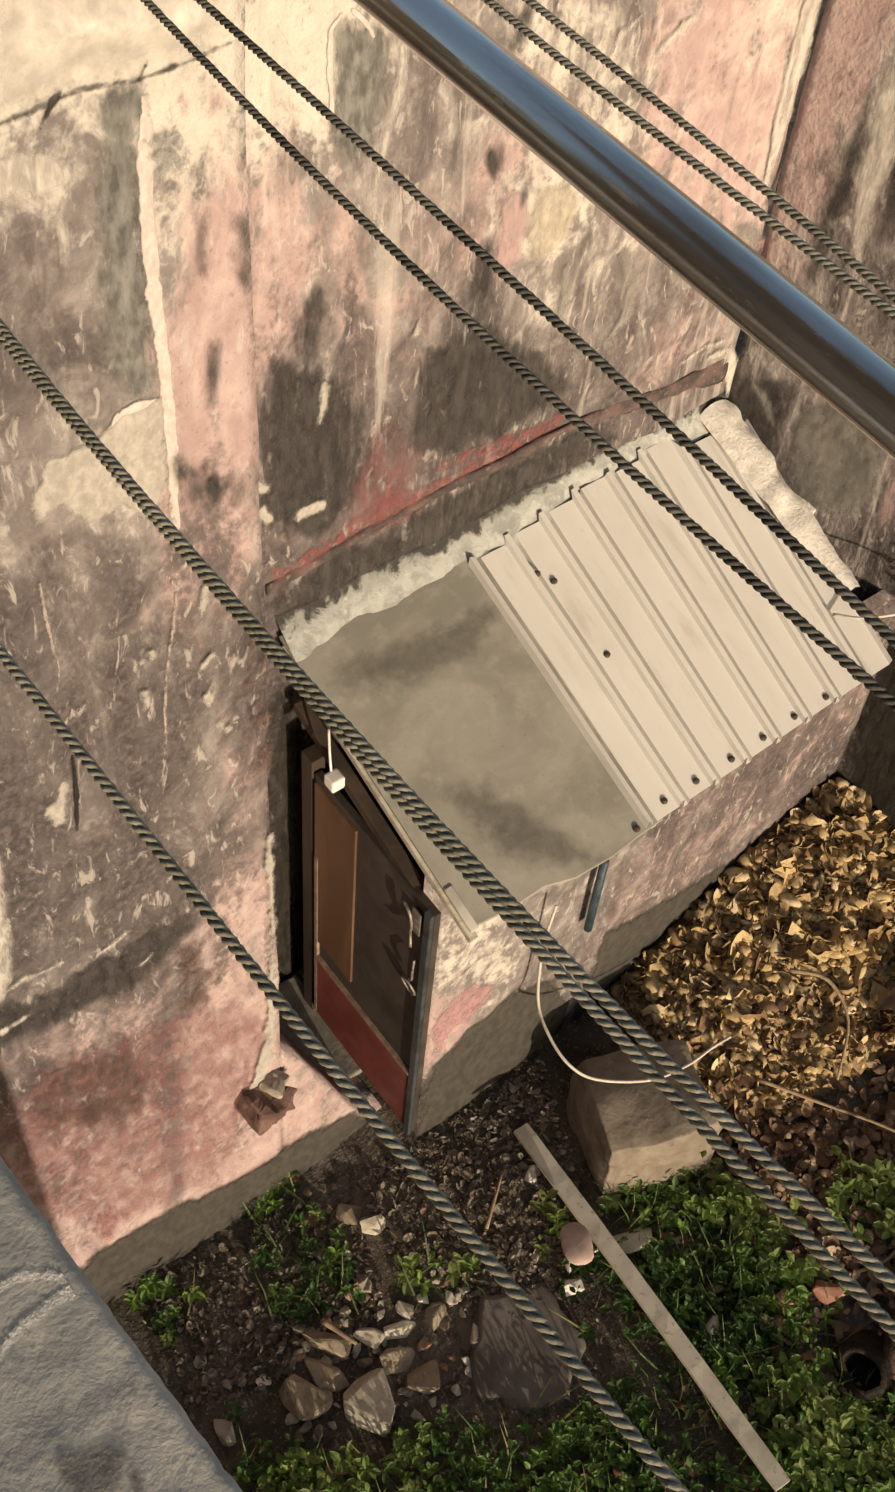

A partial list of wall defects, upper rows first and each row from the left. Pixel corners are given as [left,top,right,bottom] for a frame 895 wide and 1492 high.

leakage [57,219,69,254]
crack [0,48,215,125]
leakage [808,57,895,280]
leakage [261,289,363,538]